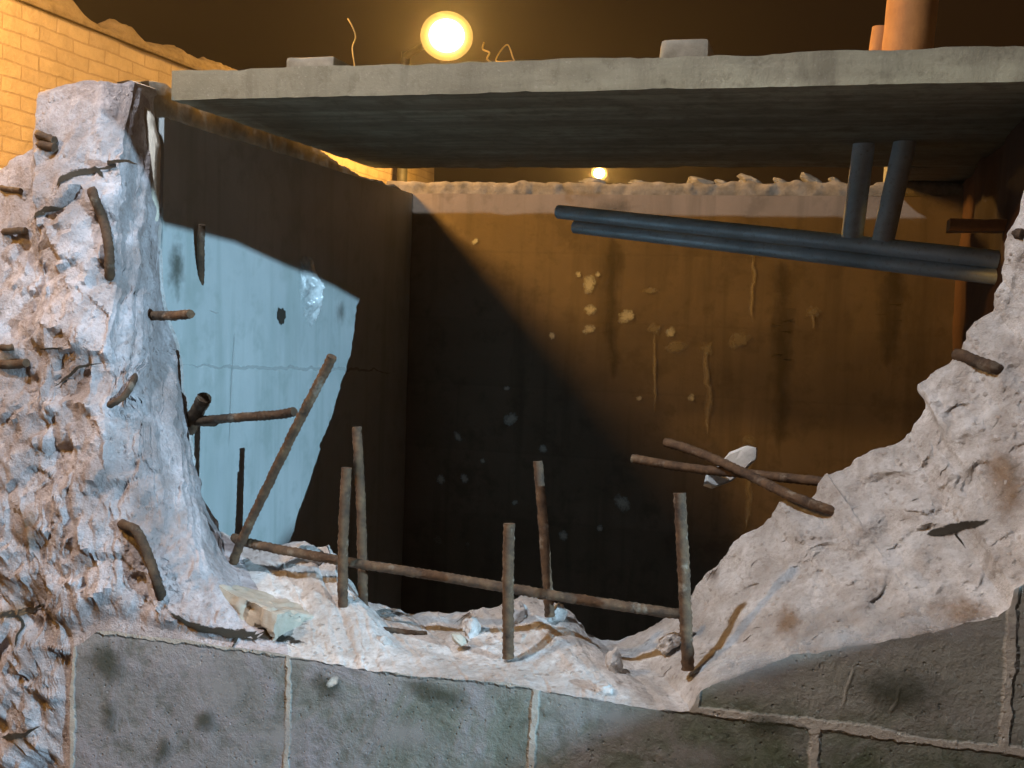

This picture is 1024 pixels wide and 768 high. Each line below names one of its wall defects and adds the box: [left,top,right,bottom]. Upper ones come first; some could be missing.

spalling [0,80,337,768]
spalling [233,196,1024,712]